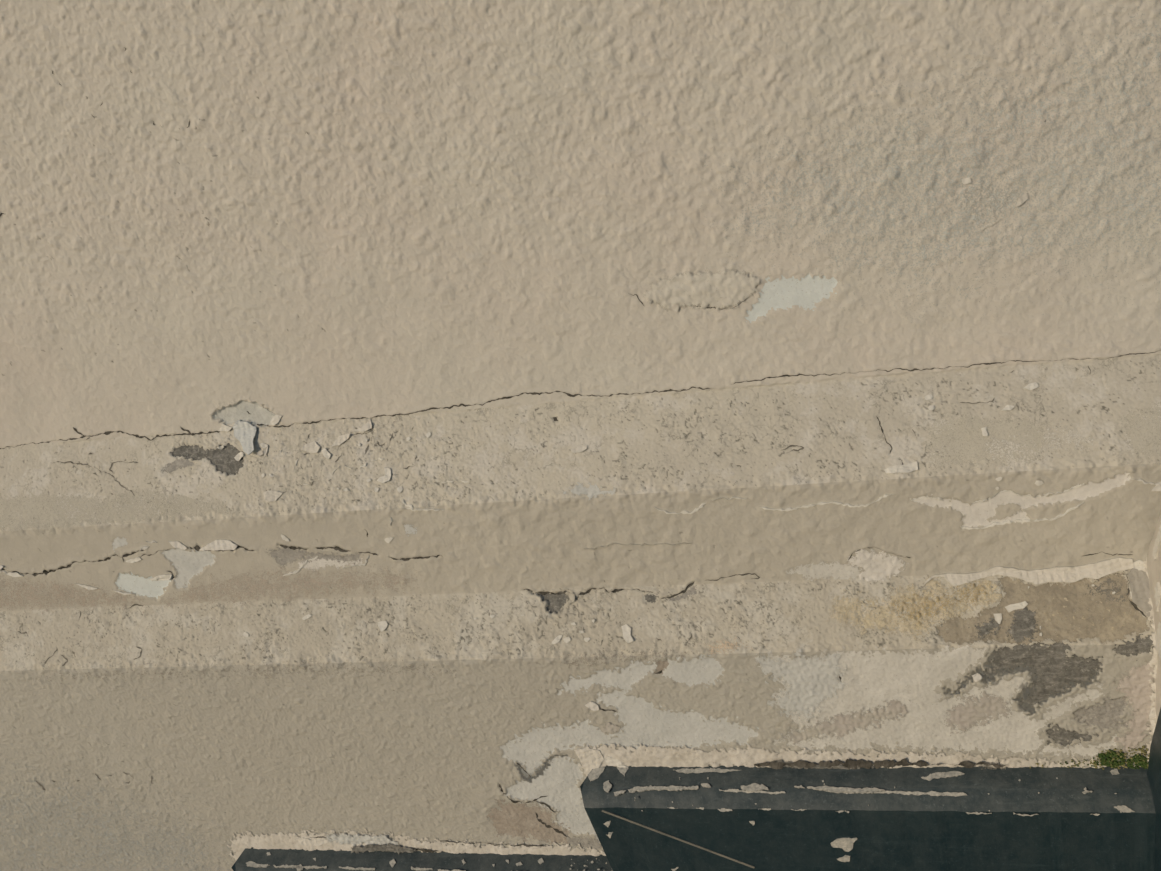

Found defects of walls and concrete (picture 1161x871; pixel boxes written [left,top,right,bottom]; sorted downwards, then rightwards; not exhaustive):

peeling [745,273,840,323]
crack [0,427,220,496]
spalling [162,401,282,476]
peeling [295,419,441,543]
crack [257,350,1160,486]
peeling [910,472,1161,530]
peeling [112,537,238,599]
peeling [266,534,369,577]
spalling [531,590,575,614]
crack [524,573,760,599]
peeling [753,521,1161,758]
peeling [486,654,759,850]